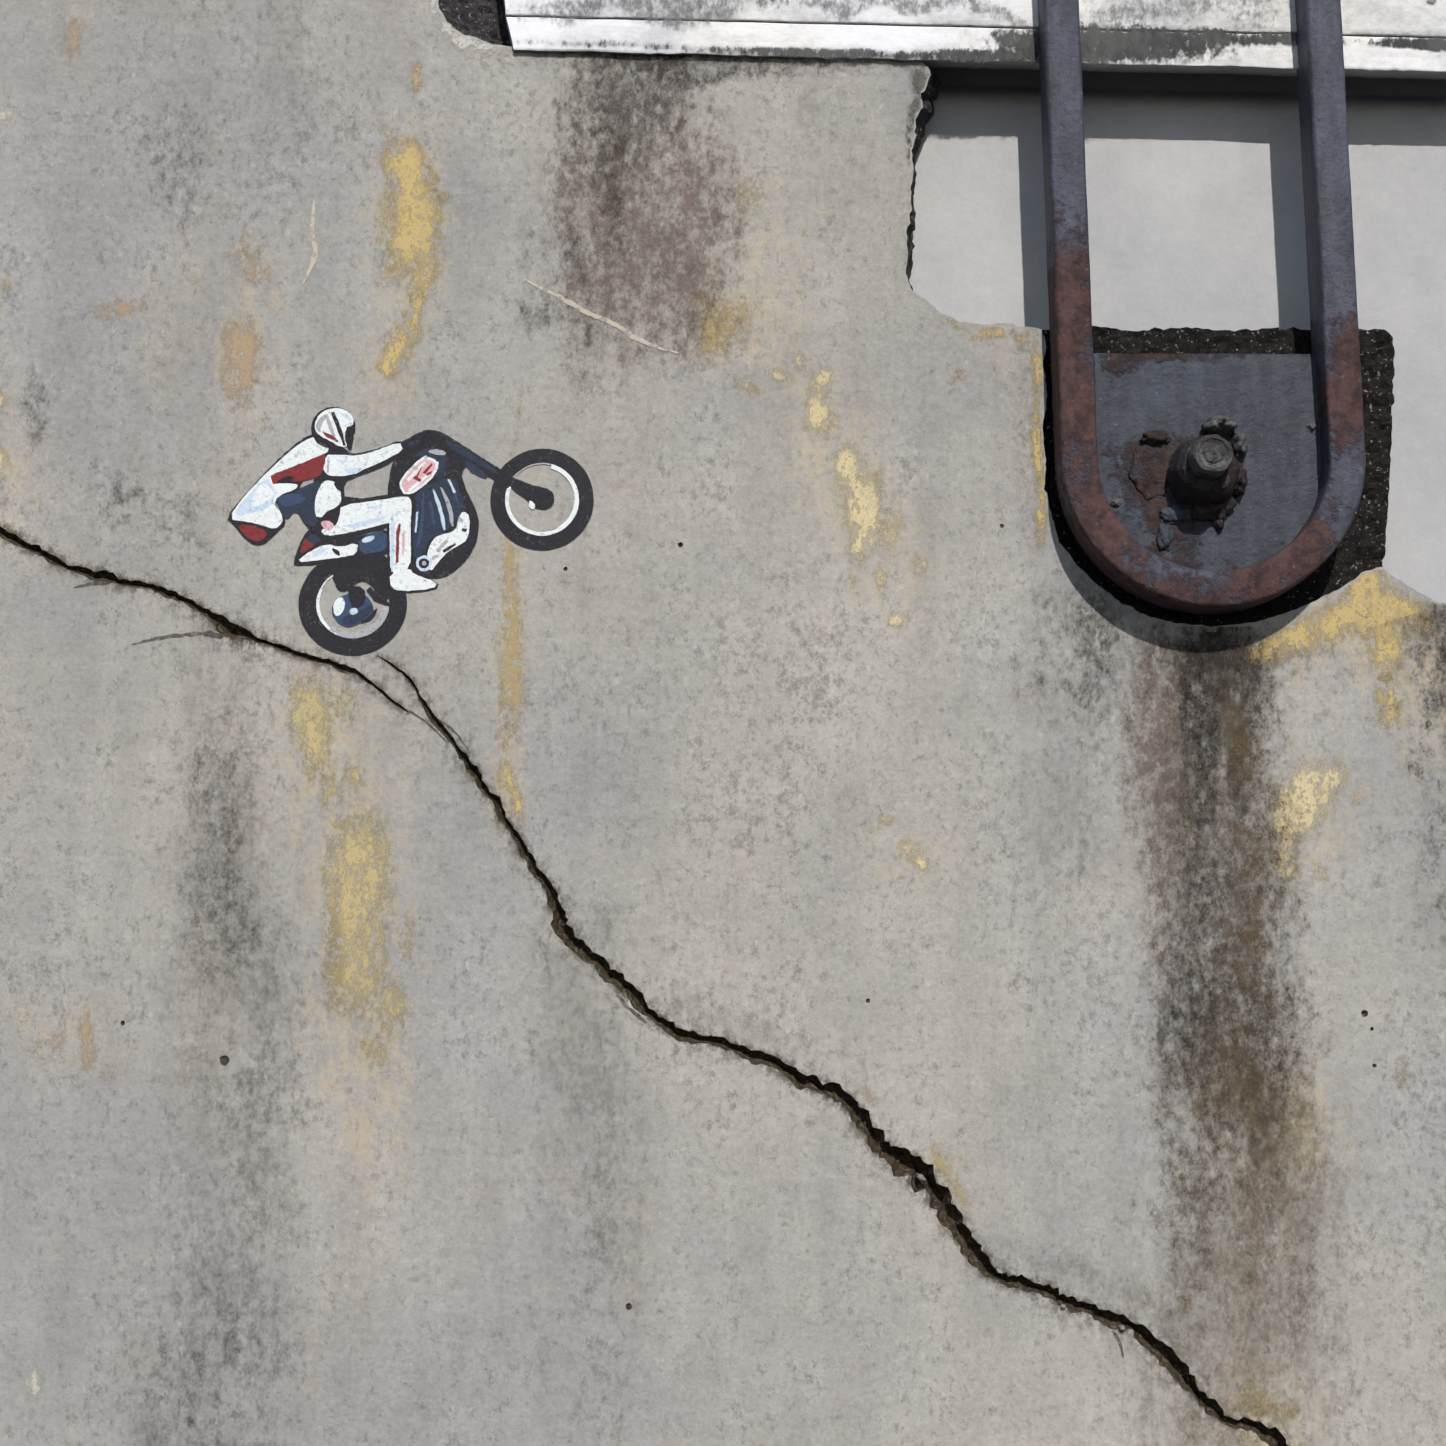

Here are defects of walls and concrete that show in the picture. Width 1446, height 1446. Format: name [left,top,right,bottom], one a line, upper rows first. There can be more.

spalling [430,0,511,63]
damp [518,0,738,29]
damp [1080,0,1298,65]
damp [1369,36,1446,51]
damp [553,0,1040,361]
spalling [906,62,941,290]
peeling [772,352,838,433]
peeling [834,445,901,560]
peeling [980,326,1046,544]
corrosion [1129,415,1248,551]
crack [0,526,1289,1446]
damp [1122,627,1308,1302]